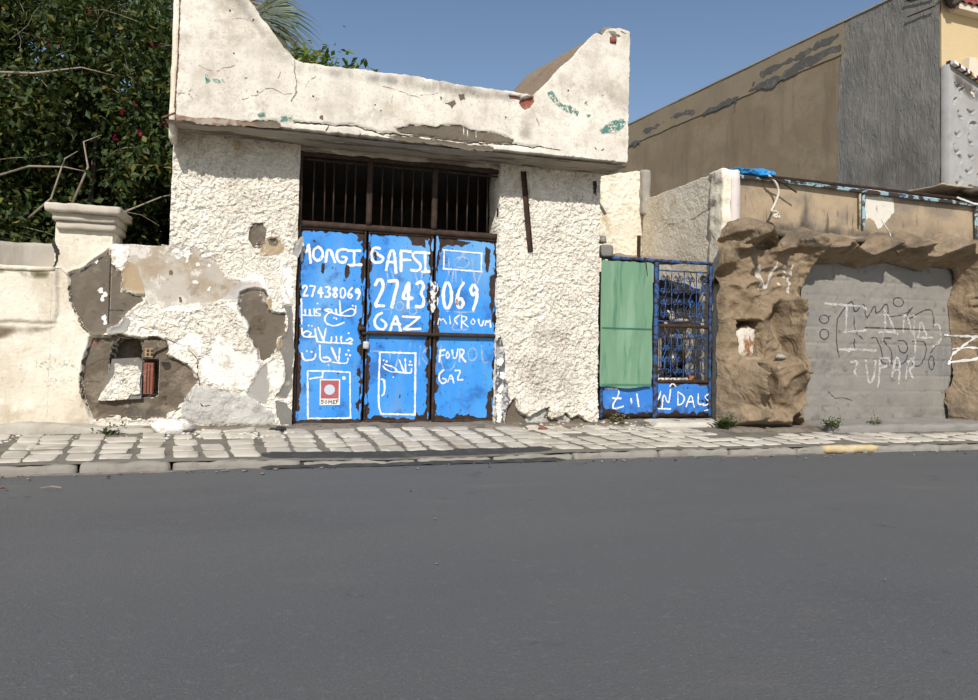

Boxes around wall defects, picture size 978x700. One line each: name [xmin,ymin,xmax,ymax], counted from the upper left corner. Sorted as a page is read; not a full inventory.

crack [242,60,559,150]
spalling [380,124,514,152]
flaking render [509,95,534,110]
peeling [248,223,285,256]
corrosion [521,171,533,252]
peeling [68,244,293,425]
peeling [495,337,589,430]